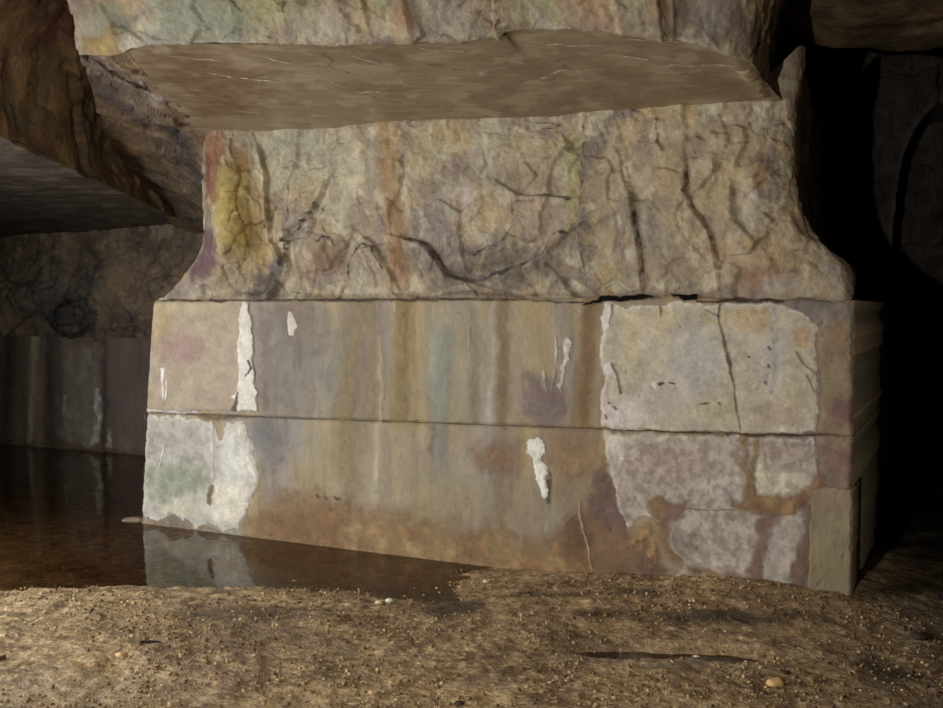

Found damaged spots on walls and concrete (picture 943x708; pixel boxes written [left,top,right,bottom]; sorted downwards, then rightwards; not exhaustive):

crack [277,185,382,275]
crack [680,165,712,240]
peeling [142,300,259,536]
water stain [249,462,598,573]
crack [162,210,816,437]
water stain [482,298,507,452]
peeling [526,438,551,502]
water stain [525,304,594,428]
rust [730,435,823,587]